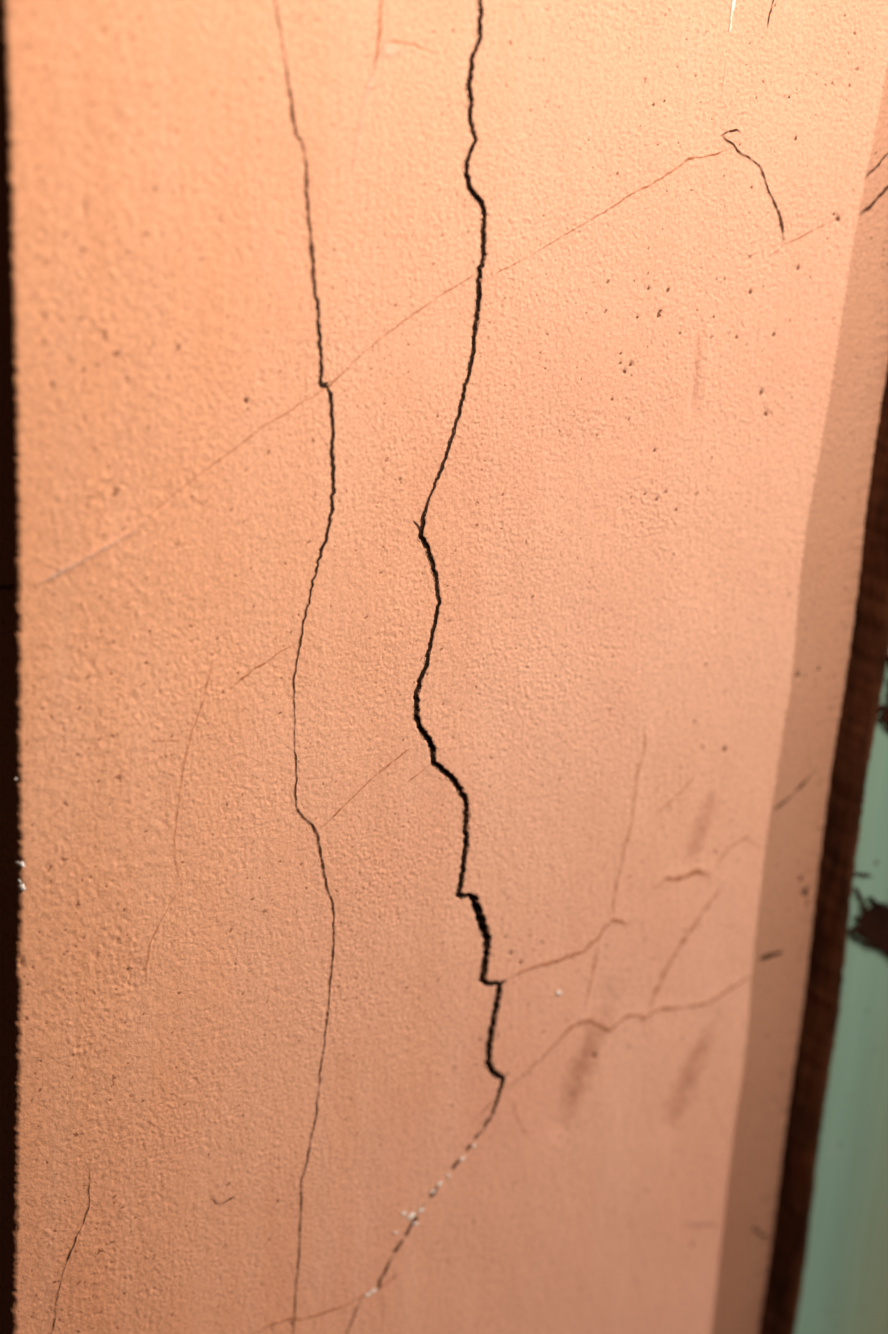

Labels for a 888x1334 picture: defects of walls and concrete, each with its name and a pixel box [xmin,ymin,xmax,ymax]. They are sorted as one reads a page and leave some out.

crack [687,129,824,237]
crack [241,0,782,1334]
crack [51,1174,90,1334]